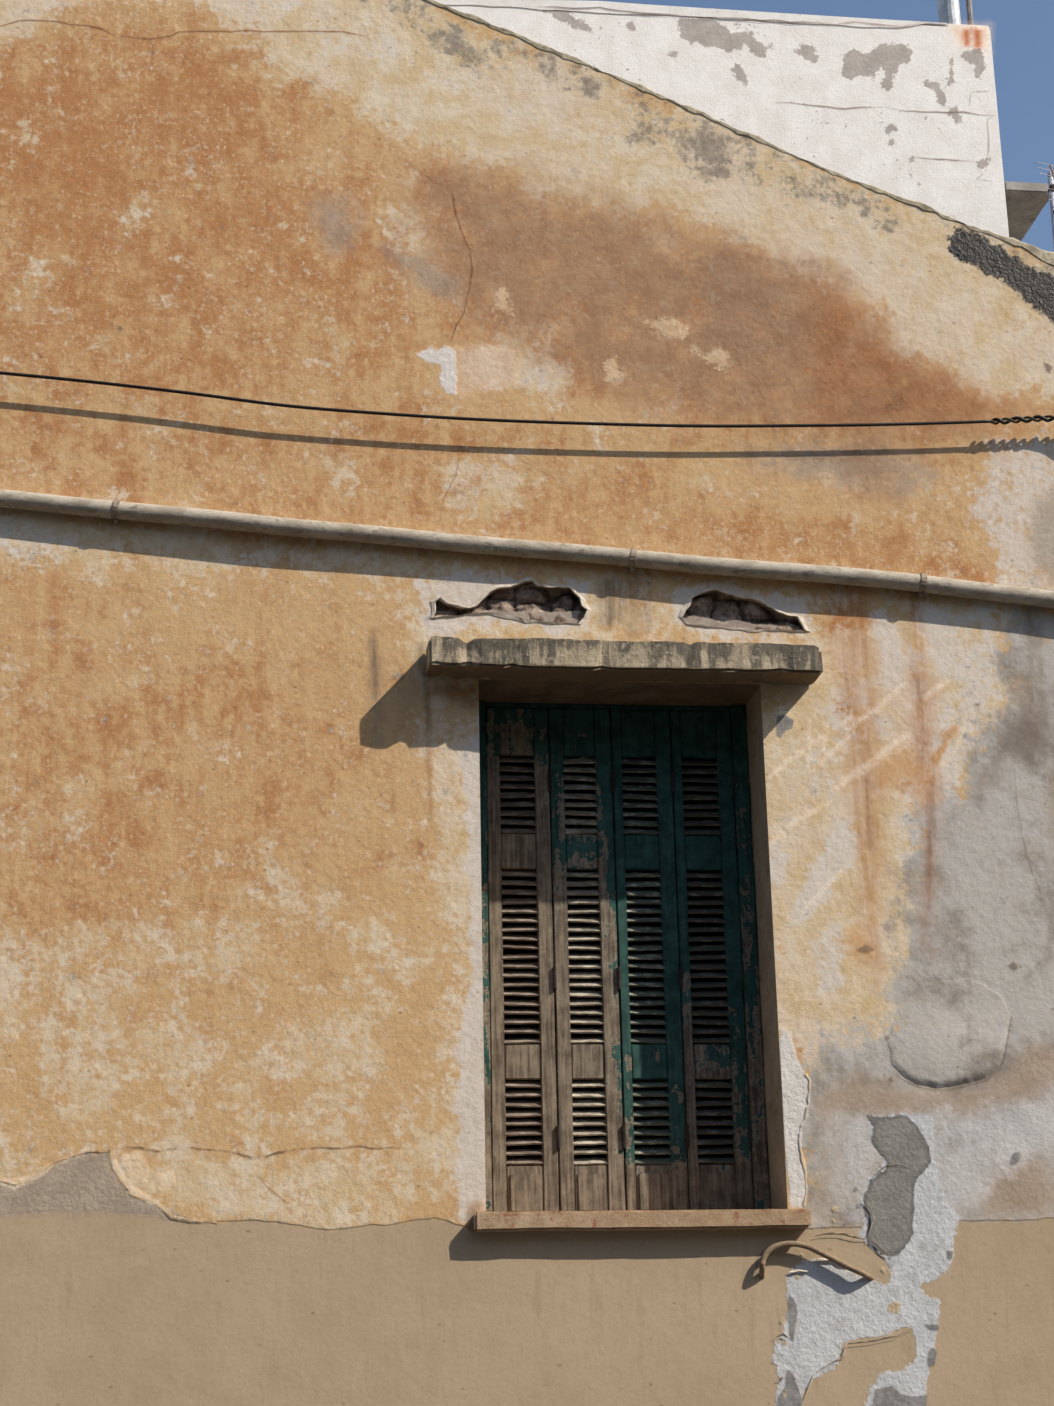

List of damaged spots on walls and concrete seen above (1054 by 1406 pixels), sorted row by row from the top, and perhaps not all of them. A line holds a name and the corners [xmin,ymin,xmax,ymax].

crack [0,19,368,39]
peeling [668,17,773,87]
peeling [841,42,913,91]
corrosion [954,26,988,49]
crack [418,168,487,341]
damp [380,164,1036,499]
spalling [430,577,592,625]
spalling [678,588,810,633]
damp [976,693,1046,802]
peeling [780,1028,811,1208]
crack [127,1143,396,1204]
peeling [771,1091,1054,1406]